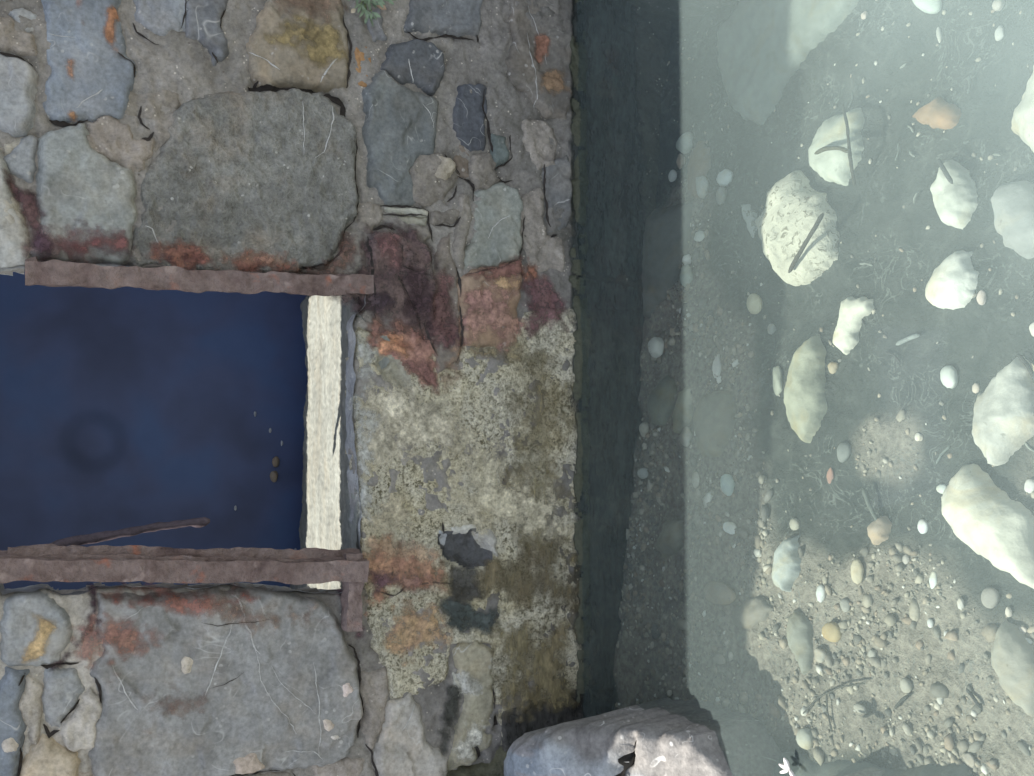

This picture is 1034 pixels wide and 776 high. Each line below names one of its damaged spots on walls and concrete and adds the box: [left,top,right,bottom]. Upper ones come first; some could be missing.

rust [6,174,130,263]
rust [151,242,210,270]
rust [225,225,564,394]
rust [51,584,148,669]
rust [141,588,278,628]
rust [365,536,452,665]